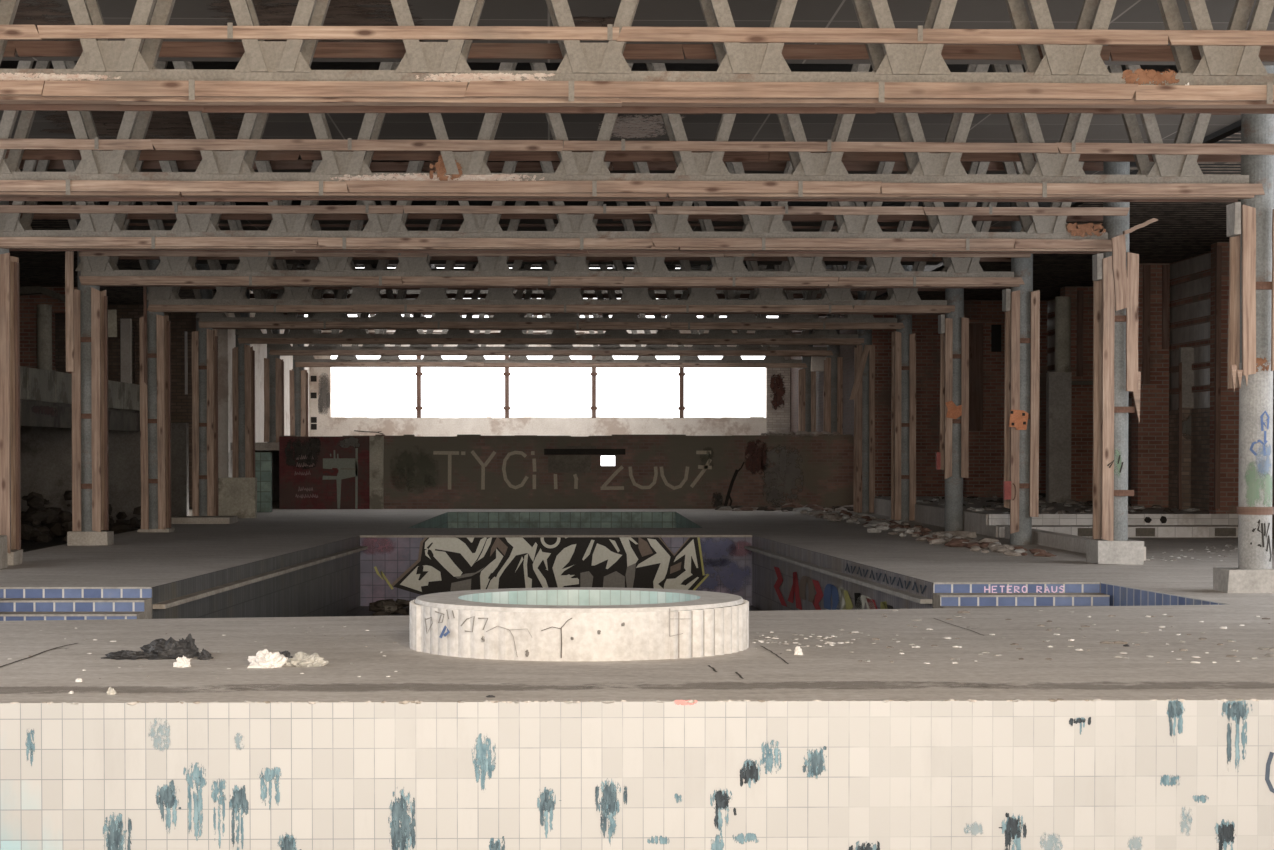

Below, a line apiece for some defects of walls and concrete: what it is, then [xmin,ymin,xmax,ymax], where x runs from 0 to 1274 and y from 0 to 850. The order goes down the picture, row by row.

peeling [472,733,496,790]
peeling [183,762,227,849]